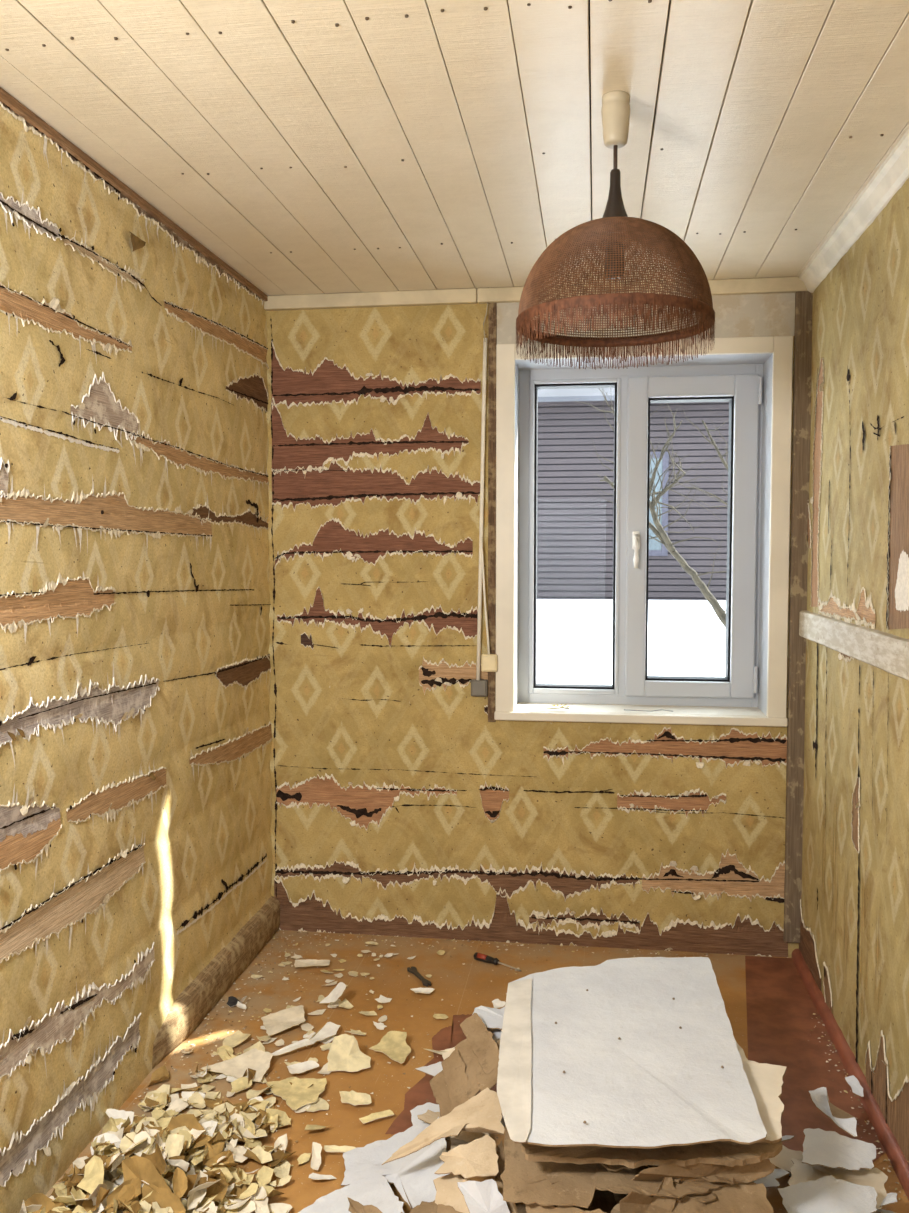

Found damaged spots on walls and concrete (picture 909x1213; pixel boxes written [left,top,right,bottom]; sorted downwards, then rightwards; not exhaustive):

peeling [745,956,885,1163]